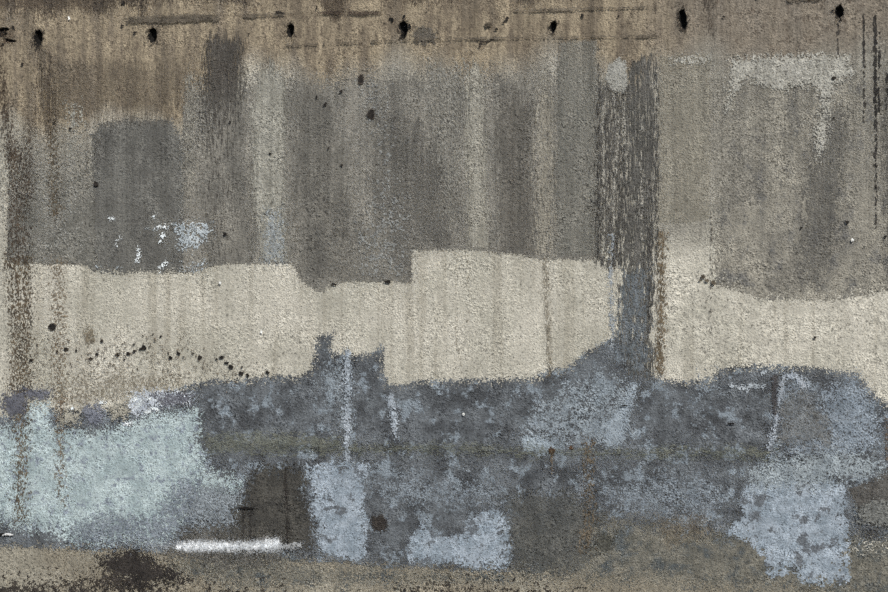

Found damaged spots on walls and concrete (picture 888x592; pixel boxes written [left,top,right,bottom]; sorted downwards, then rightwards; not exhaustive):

leakage [0,0,276,28]
leakage [288,0,346,22]
corrosion [0,42,270,527]
corrosion [653,228,670,375]
leakage [93,457,888,592]